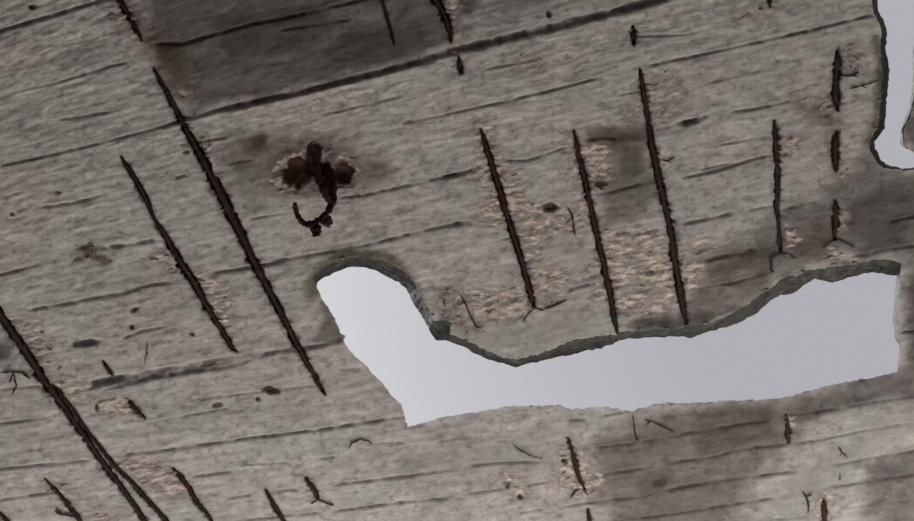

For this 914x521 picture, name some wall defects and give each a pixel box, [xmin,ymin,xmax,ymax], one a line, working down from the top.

spalling [869,0,914,171]
crack [588,182,609,190]
spalling [313,68,902,367]
crack [822,237,855,248]
crack [0,370,31,395]
crack [54,508,75,517]